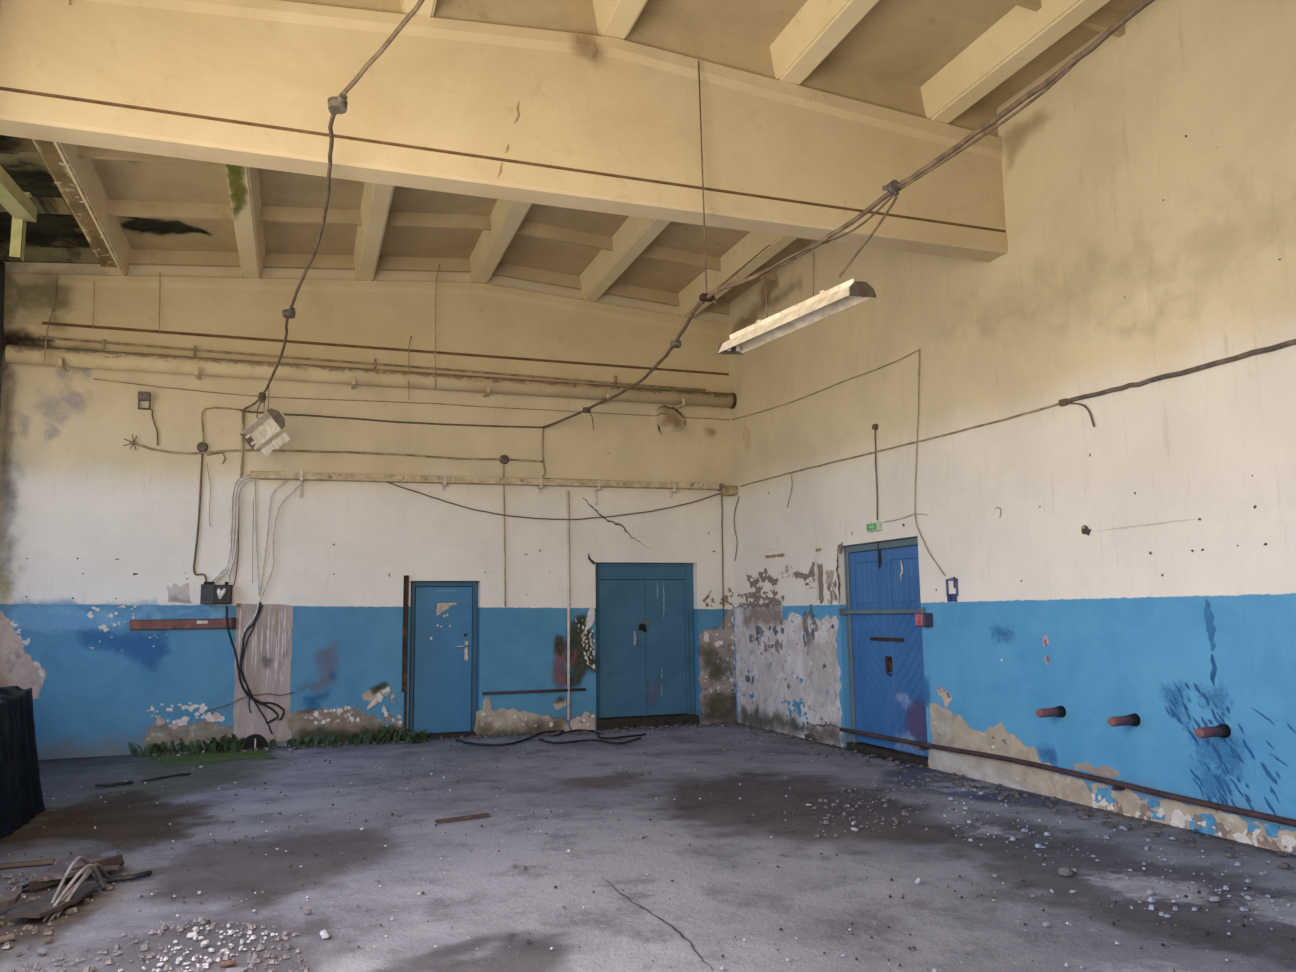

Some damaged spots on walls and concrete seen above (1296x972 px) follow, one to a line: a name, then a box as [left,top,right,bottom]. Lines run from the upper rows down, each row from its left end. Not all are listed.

water stain [11,171,64,198]
water stain [0,212,90,248]
crack [582,497,650,549]
peeling [87,598,137,651]
peeling [0,611,46,700]
peeling [698,557,843,747]
peeling [144,702,233,749]
flaking render [287,683,403,745]
flaking render [474,697,596,736]
peeling [812,687,1296,930]